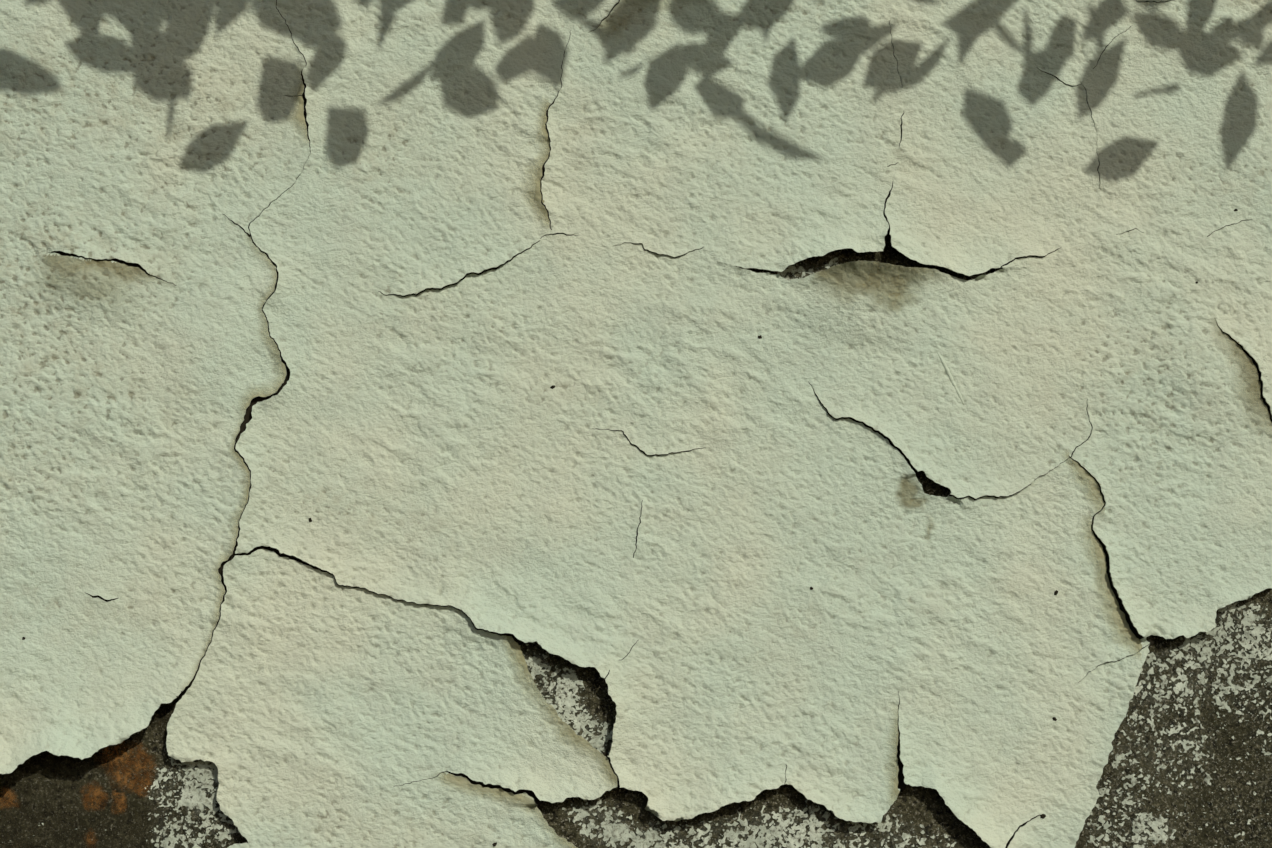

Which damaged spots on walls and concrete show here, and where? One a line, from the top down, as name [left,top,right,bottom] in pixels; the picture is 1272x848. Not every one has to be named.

crack [378,0,620,297]
crack [736,113,1060,281]
rust [84,744,153,811]
spalling [0,626,264,848]
crack [178,0,524,700]
crack [400,771,543,808]
peeling [226,511,1054,848]
peeling [606,423,697,455]
crack [809,383,919,476]
spalling [812,384,1272,848]
crack [947,399,1154,683]
peeling [1217,319,1272,415]